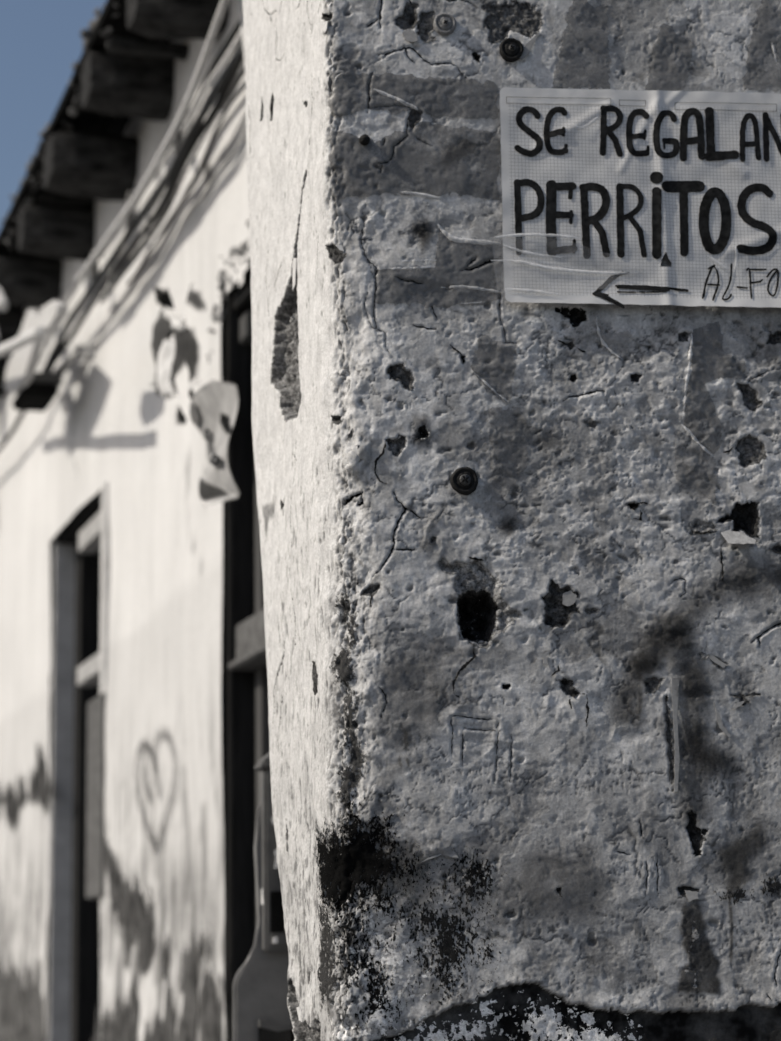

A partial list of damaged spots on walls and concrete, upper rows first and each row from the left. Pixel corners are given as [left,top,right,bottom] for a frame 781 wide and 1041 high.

flaking render [482,0,543,60]
crack [367,47,467,173]
flaking render [271,170,307,423]
crack [373,492,422,576]
flaking render [689,501,760,582]
spalling [439,557,522,697]
flaking render [638,677,680,792]
peeling [287,579,642,1041]